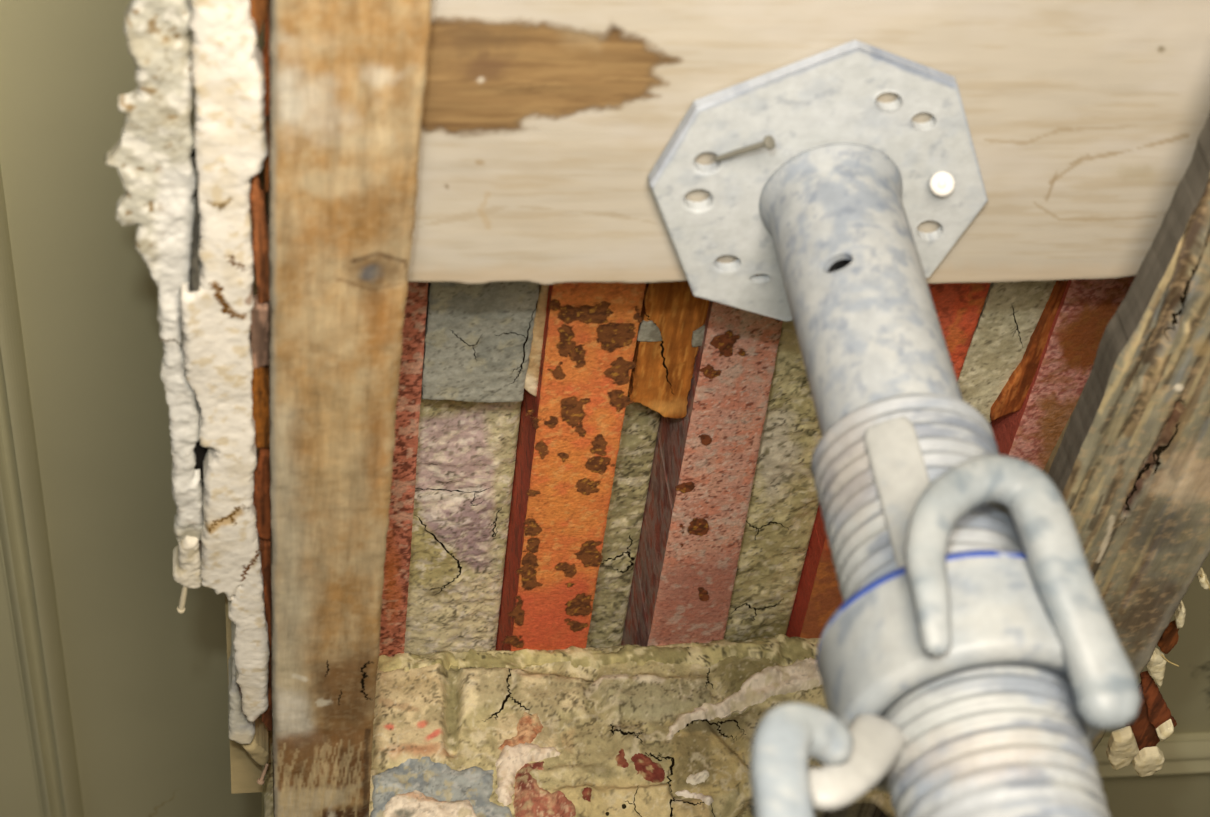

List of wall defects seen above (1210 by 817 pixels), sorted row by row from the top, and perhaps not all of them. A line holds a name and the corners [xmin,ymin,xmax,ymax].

flaking render [105,0,270,723]
crack [450,301,538,384]
rust [548,299,643,412]
rust [700,330,746,379]
rust [527,396,615,495]
rust [502,519,542,648]
rust [555,540,603,632]
crack [484,669,532,722]
spalling [498,712,543,751]
spalling [513,761,592,817]
spalling [615,749,665,783]
crack [608,719,746,817]